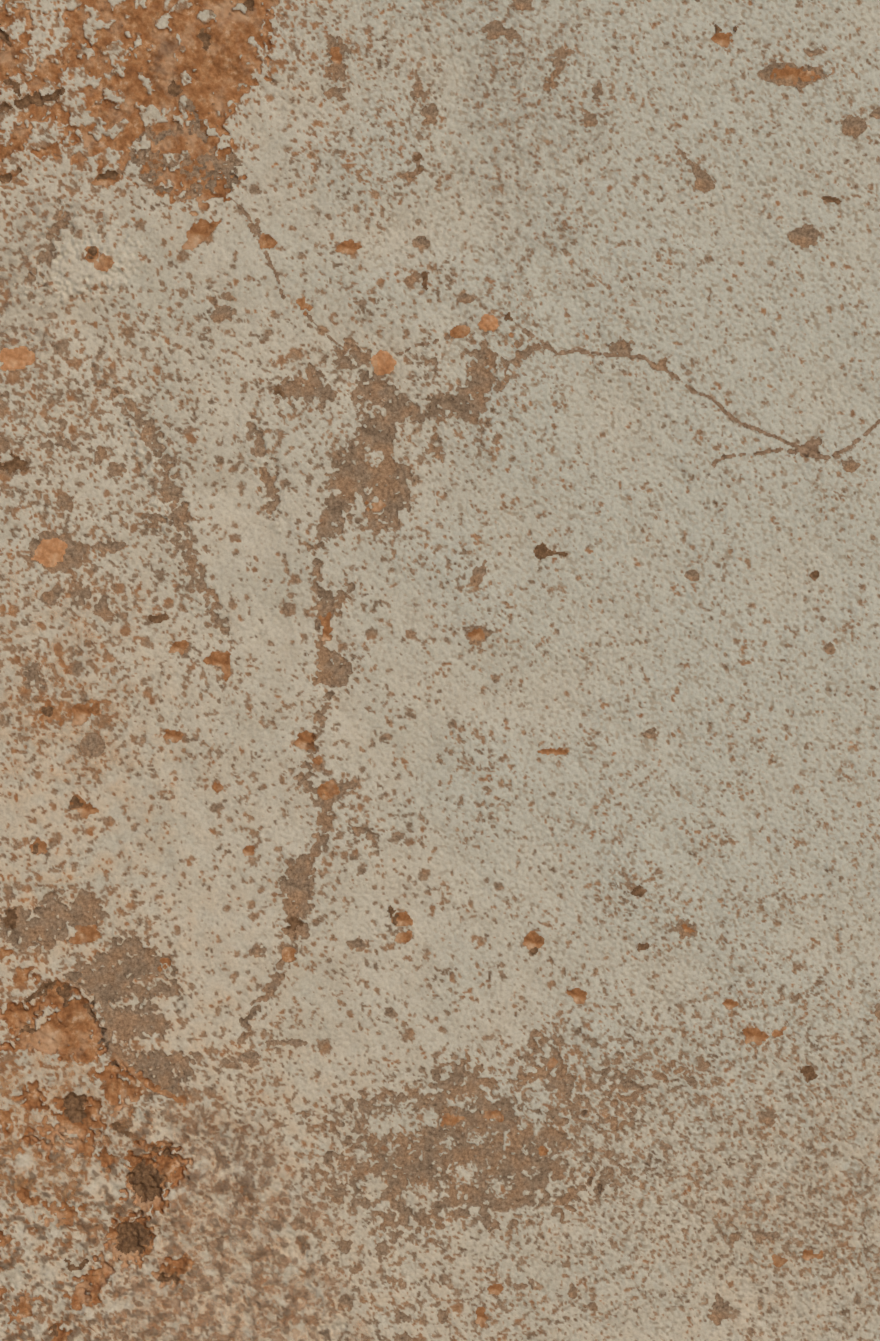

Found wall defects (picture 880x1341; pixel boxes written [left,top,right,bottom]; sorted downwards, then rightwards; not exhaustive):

spalling [0,0,280,251]
crack [236,204,337,345]
crack [397,335,450,355]
crack [522,328,880,468]
peeling [0,888,201,1168]
peeling [296,1029,711,1257]
spalling [127,1146,178,1203]
spalling [16,1187,88,1228]
spalling [64,1258,89,1272]
spalling [115,1221,152,1255]
peeling [336,1237,363,1274]
spalling [47,1320,73,1341]